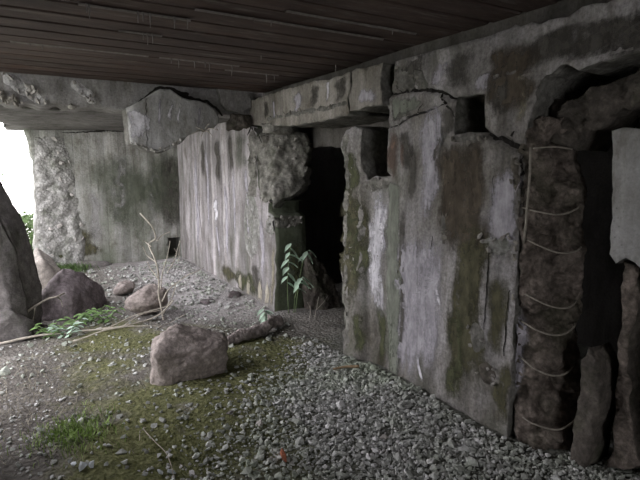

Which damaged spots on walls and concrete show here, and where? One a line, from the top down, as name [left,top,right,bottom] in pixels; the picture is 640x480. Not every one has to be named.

damp [326,77,346,101]
crack [391,85,458,128]
damp [433,54,472,86]
damp [475,11,640,120]
damp [228,138,242,169]
damp [194,141,236,256]
damp [368,109,519,398]
crack [483,253,491,322]
damp [353,314,365,351]
crack [502,290,510,356]
damp [491,366,512,421]